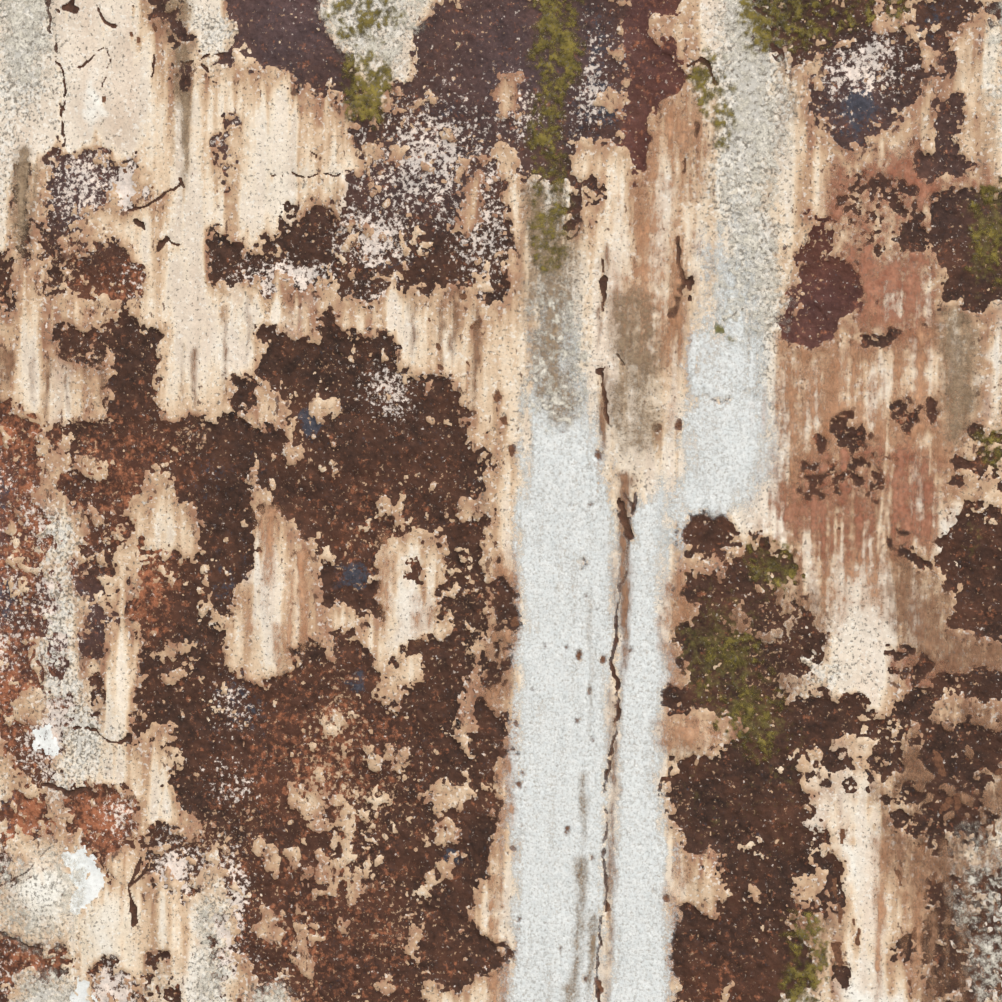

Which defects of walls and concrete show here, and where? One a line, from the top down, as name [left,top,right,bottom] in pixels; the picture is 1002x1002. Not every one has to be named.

crack [44,0,118,147]
corrosion [742,0,1002,152]
crack [127,177,185,212]
peeling [52,293,84,328]
corrosion [0,0,707,1002]
corrosion [653,92,1002,1002]
crack [595,488,638,1002]
peeling [61,845,159,1002]